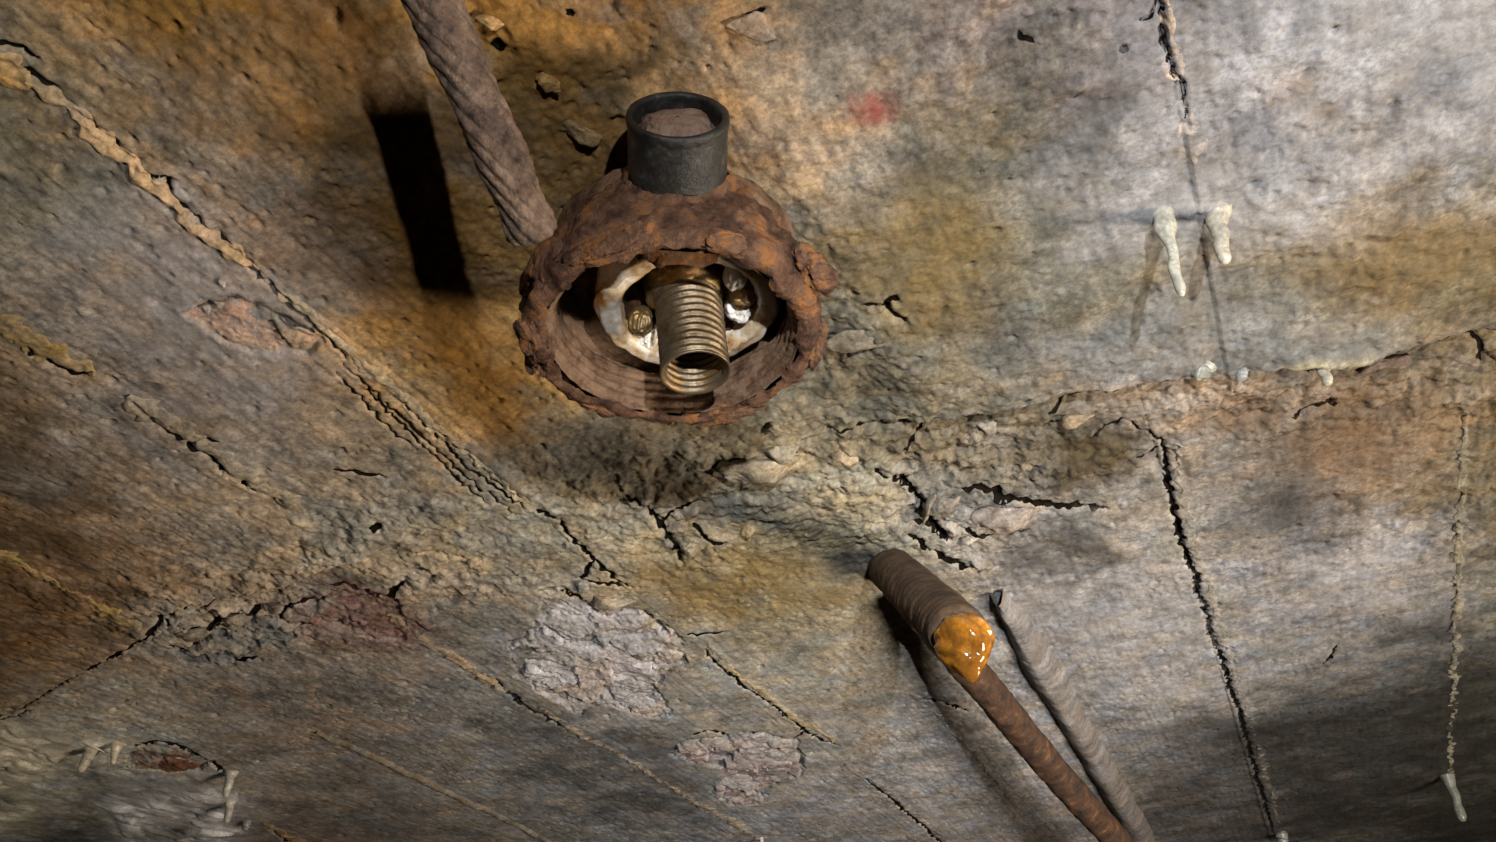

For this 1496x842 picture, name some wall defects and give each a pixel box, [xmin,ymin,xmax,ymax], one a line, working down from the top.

spalling [182,294,326,357]
crack [0,40,654,618]
crack [1292,363,1342,420]
crack [1438,328,1496,360]
crack [621,489,724,561]
crack [837,413,1106,573]
crack [134,740,224,772]
crack [0,580,406,720]
spalling [507,579,688,719]
spalling [667,731,807,807]
crack [687,631,837,762]
crack [1048,376,1274,833]